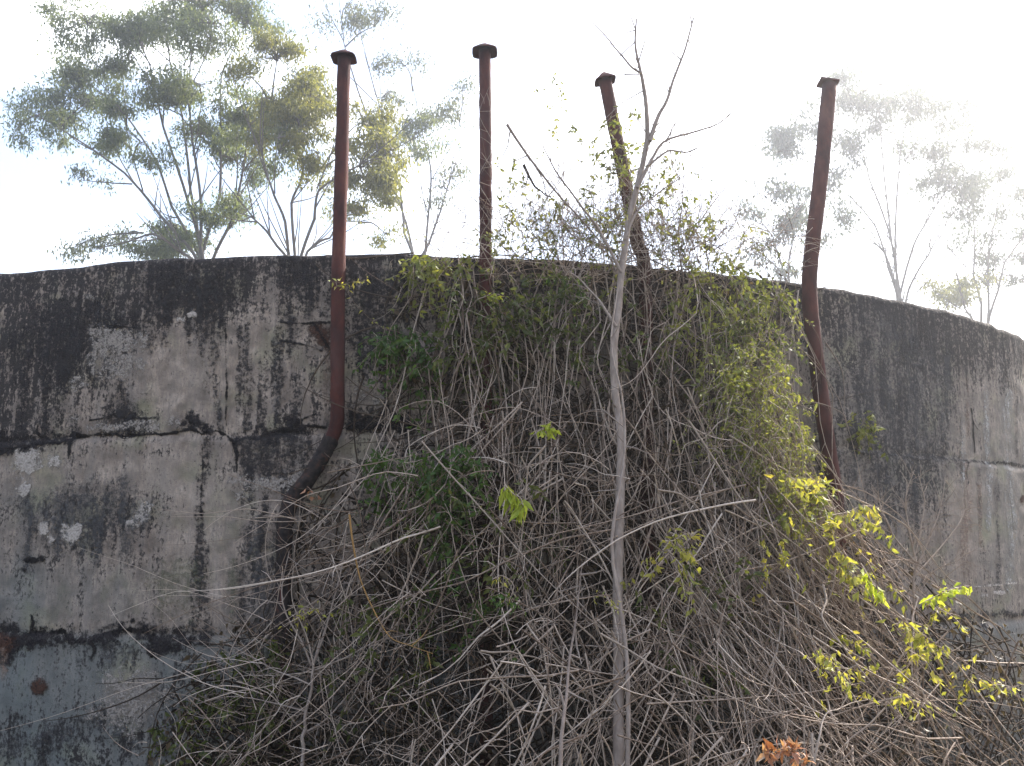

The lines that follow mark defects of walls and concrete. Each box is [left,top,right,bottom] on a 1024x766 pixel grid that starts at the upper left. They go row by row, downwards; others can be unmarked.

damp [5,257,330,643]
crack [0,328,418,516]
damp [823,294,965,546]
damp [978,389,1024,593]
corrosion [31,678,48,695]